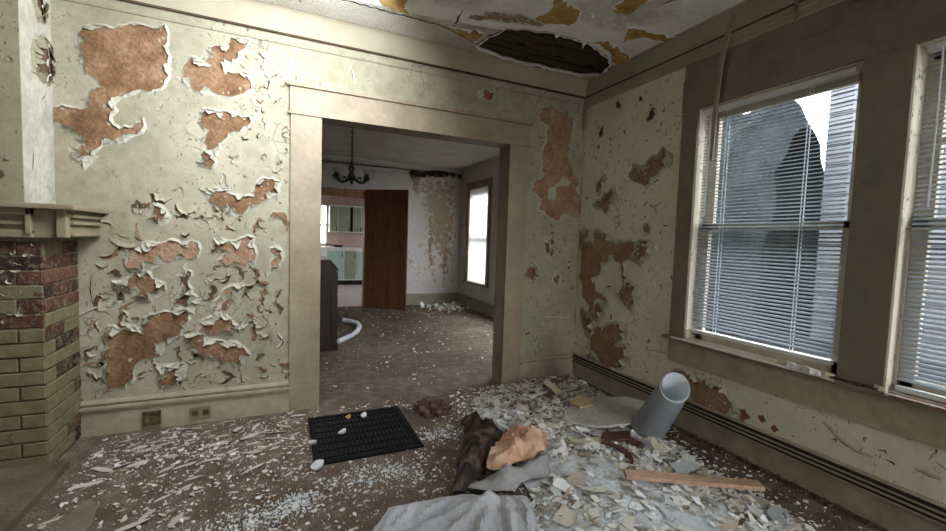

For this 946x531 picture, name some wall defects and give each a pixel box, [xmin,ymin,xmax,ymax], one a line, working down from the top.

peeling [450,0,676,77]
peeling [628,145,675,189]
peeling [52,21,290,398]
peeling [523,104,653,372]
peeling [0,244,40,324]
peeling [671,367,779,433]